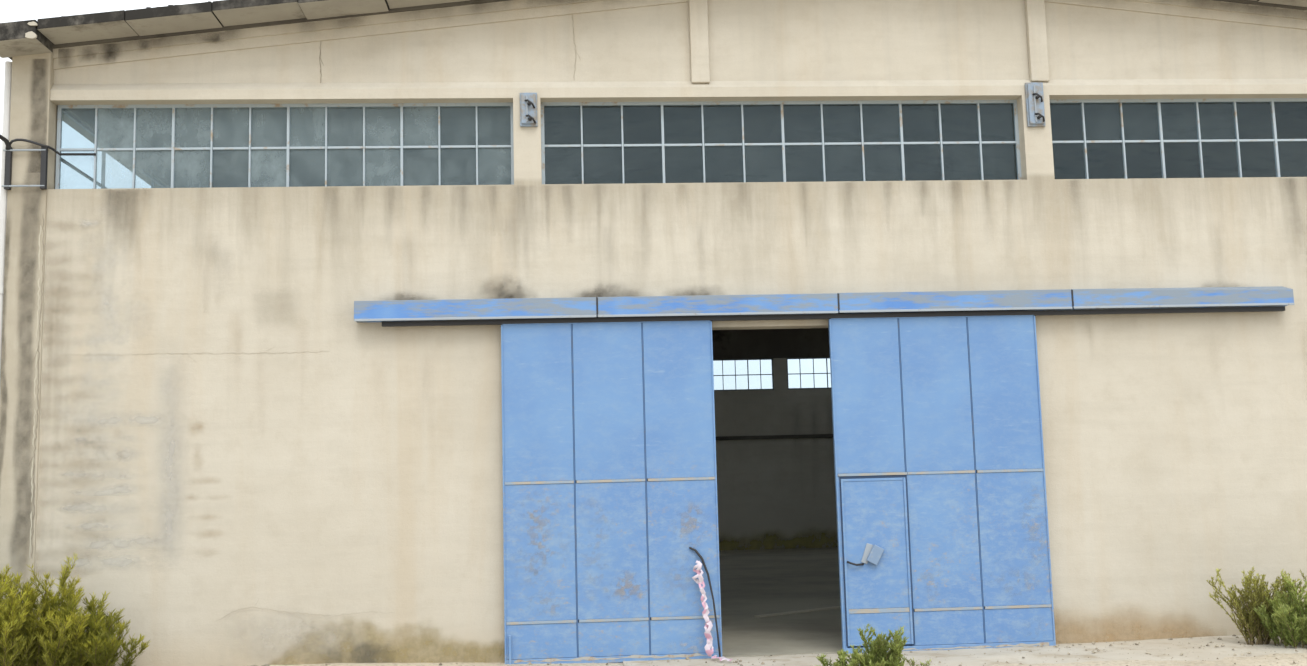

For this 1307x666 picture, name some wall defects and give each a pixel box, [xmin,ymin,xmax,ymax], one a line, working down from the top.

leakage [32,59,45,160]
leakage [272,627,505,665]